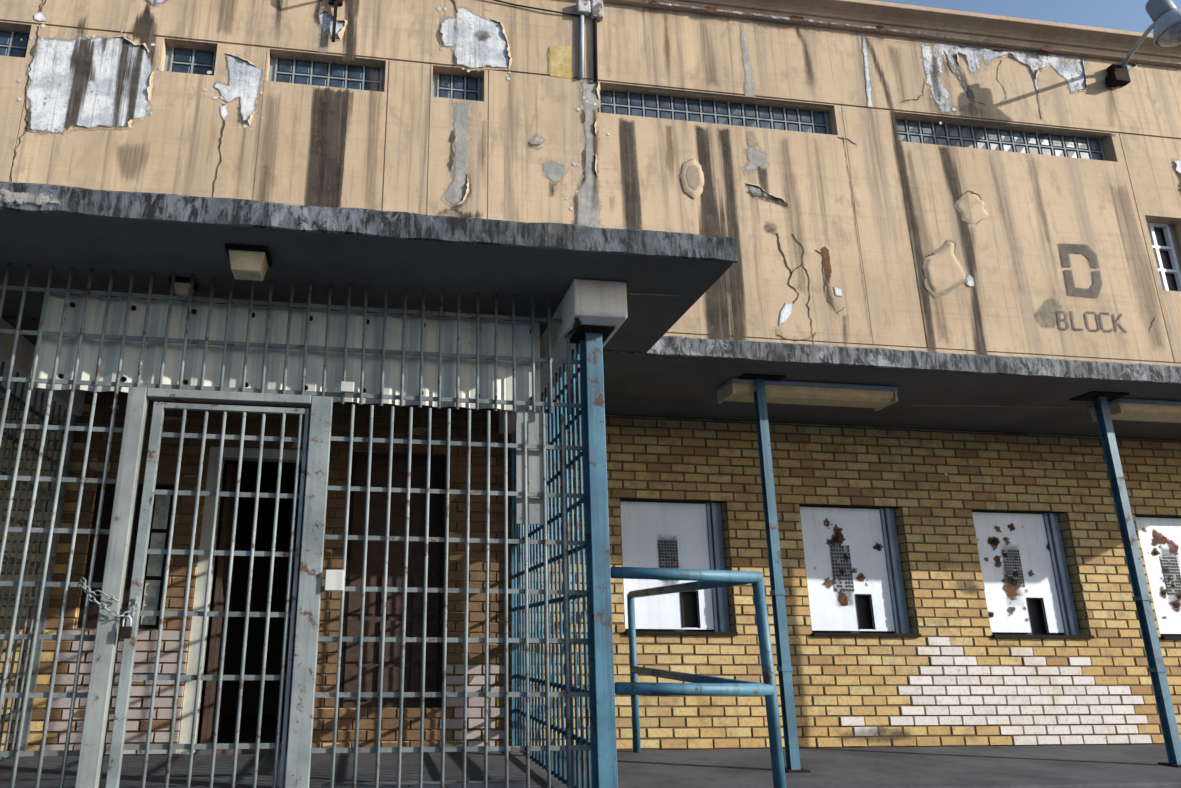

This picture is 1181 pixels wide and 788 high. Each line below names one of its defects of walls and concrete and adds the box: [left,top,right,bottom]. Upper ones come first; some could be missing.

crack [11,0,47,182]
peeling [17,24,164,134]
crack [212,104,229,197]
damp [305,87,354,207]
peeling [437,3,514,80]
peeling [528,46,611,228]
peeling [636,0,1087,124]
damp [696,126,746,340]
crack [776,233,816,344]
rust [815,247,845,314]
rust [823,518,868,606]
rust [978,523,1034,621]